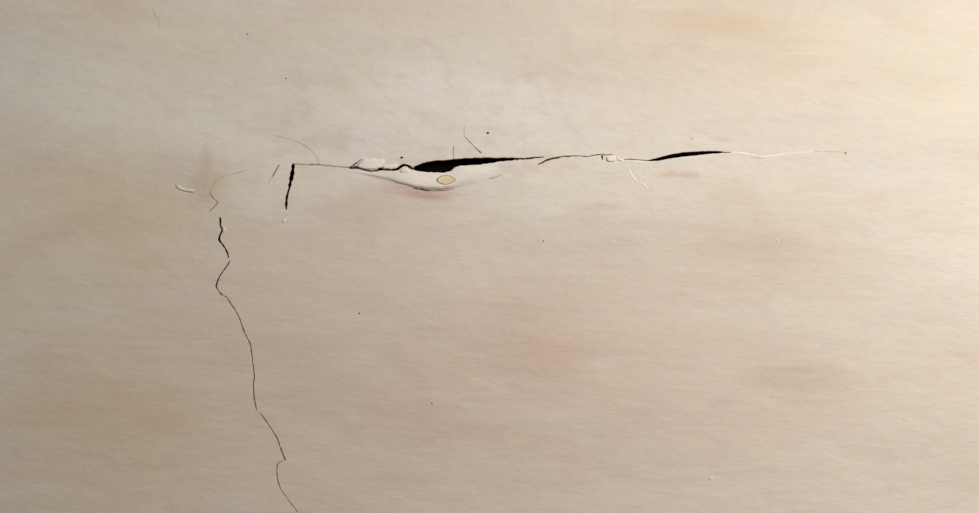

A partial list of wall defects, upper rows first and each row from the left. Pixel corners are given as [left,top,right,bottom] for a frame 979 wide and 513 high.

peeling [357,158,410,173]
crack [268,126,731,210]
crack [209,170,299,513]